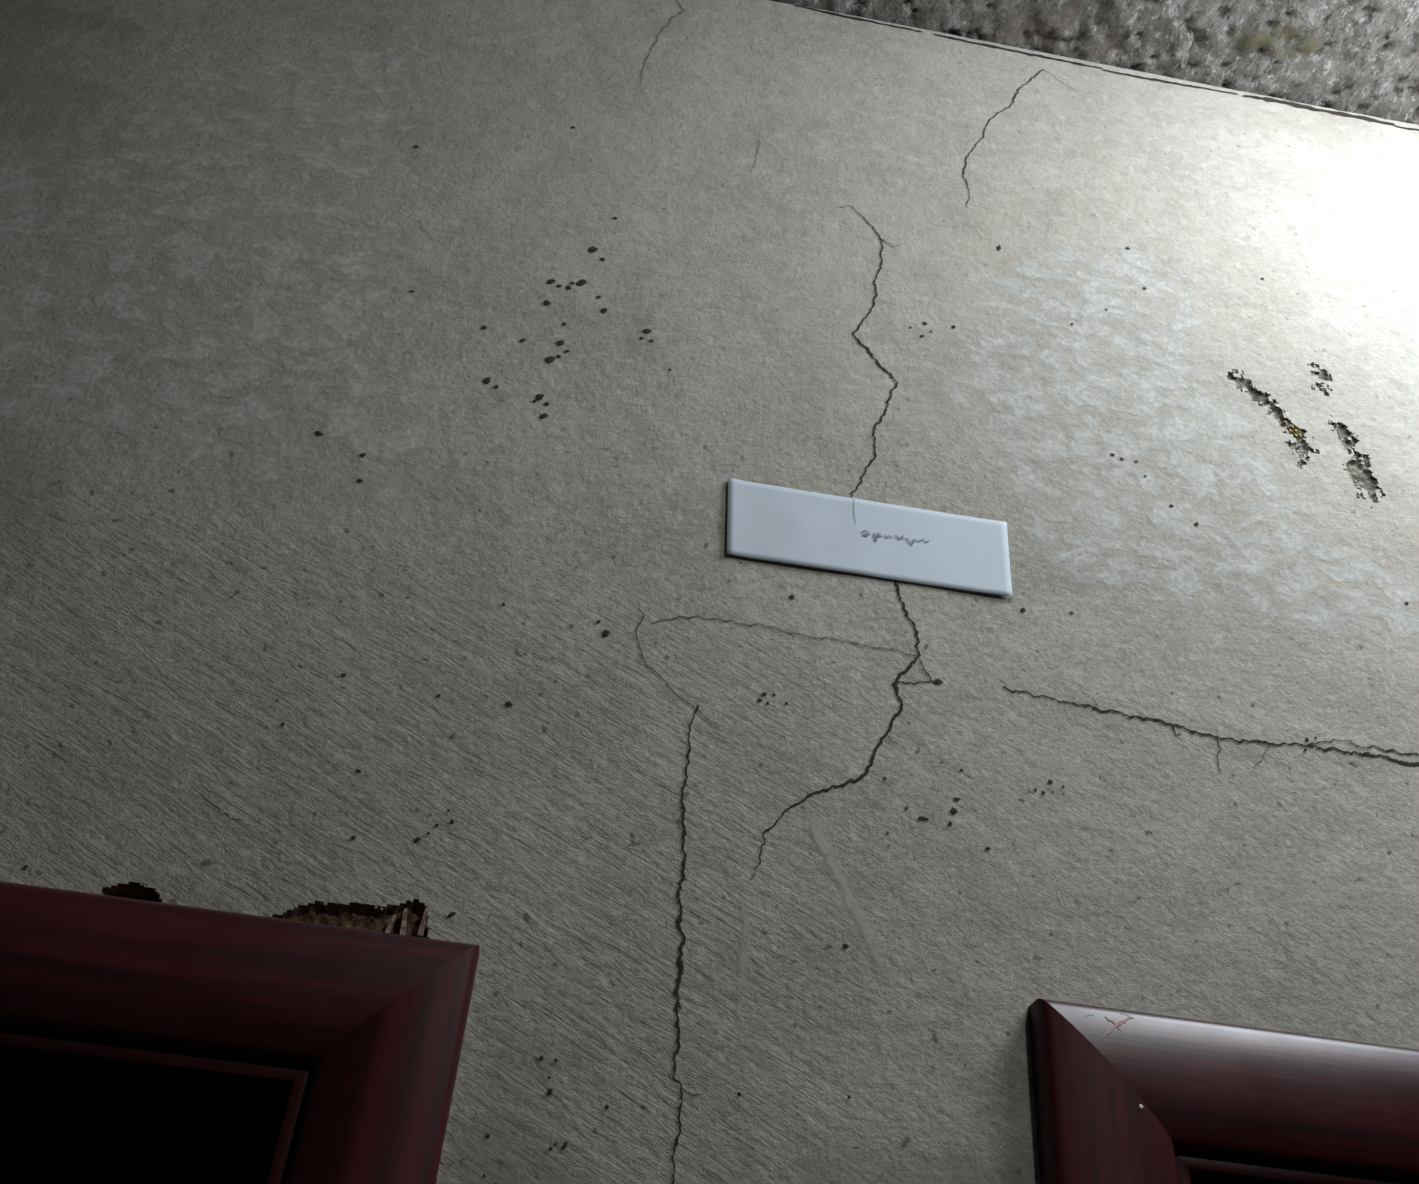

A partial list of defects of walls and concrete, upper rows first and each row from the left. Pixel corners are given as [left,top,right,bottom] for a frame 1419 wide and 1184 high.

crack [774,0,1419,207]
crack [844,205,899,498]
flaking render [1226,369,1320,469]
flaking render [1308,362,1333,396]
flaking render [1328,415,1386,508]
crack [1003,686,1419,771]
flaking render [268,898,430,939]
crack [635,580,936,1184]